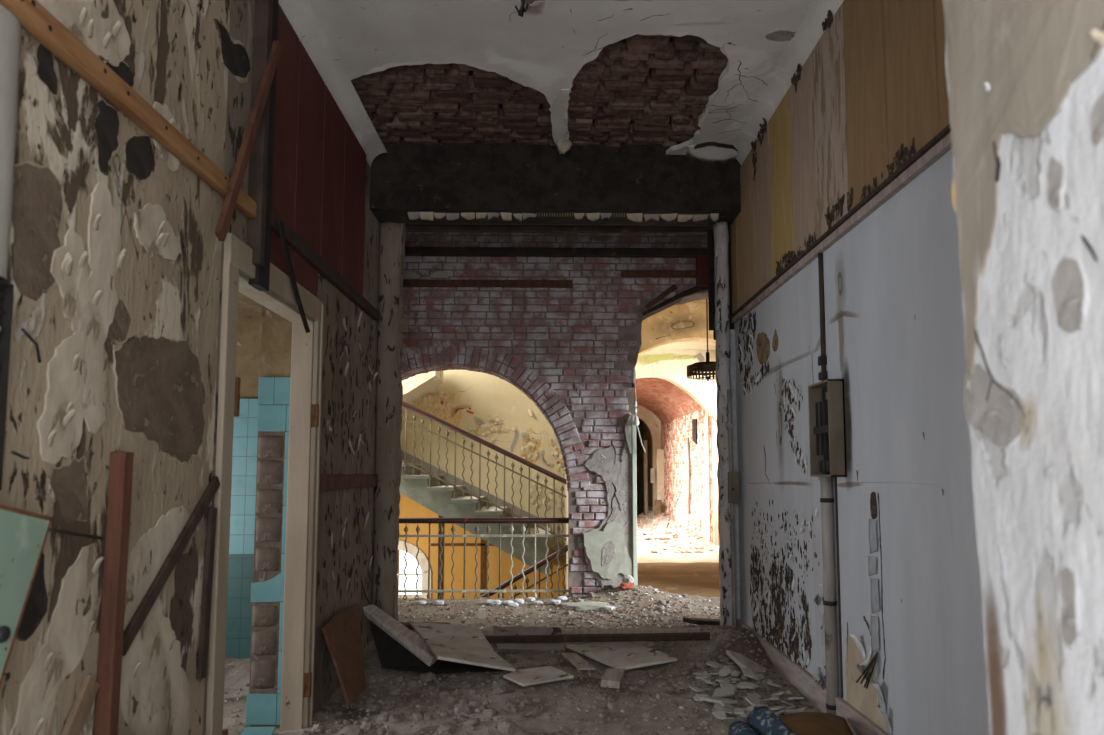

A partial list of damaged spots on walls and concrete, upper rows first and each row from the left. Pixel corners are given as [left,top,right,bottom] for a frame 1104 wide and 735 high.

flaking render [34,43,58,95]
flaking render [37,0,134,87]
flaking render [214,19,251,83]
flaking render [350,31,729,154]
peeling [1089,28,1104,46]
spalling [1090,93,1104,148]
peeling [825,138,916,230]
spalling [1046,155,1065,214]
flaking render [10,98,205,523]
spalling [1051,235,1098,334]
peeling [781,378,807,474]
water stain [750,500,819,669]